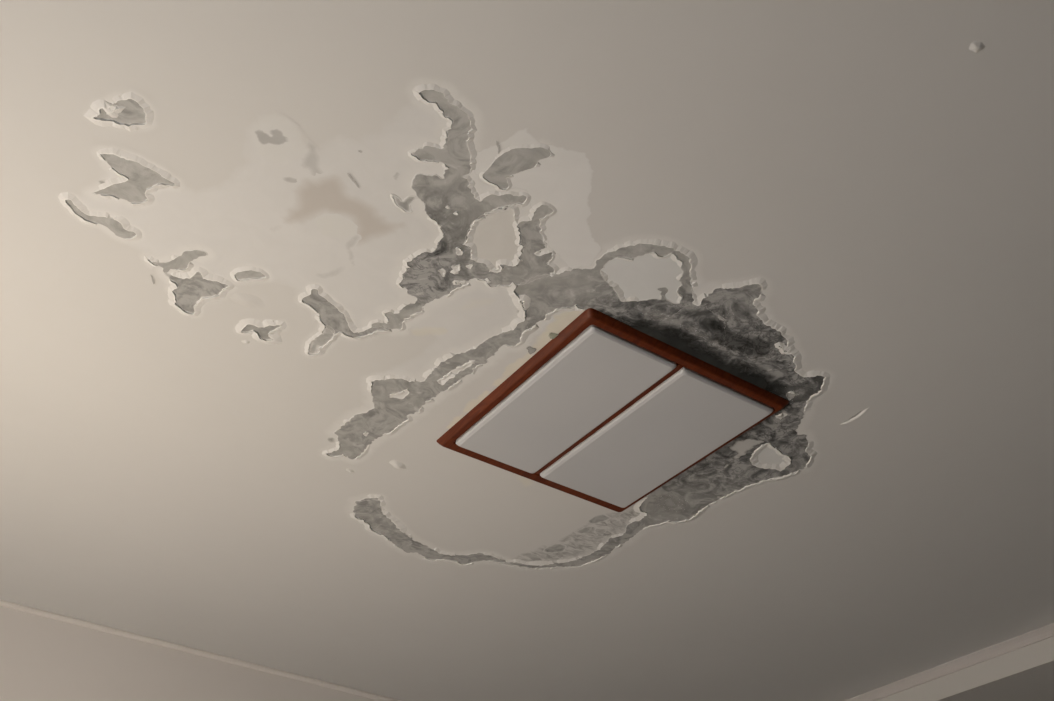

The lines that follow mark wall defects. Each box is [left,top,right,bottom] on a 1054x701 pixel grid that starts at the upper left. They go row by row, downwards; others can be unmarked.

peeling [51,83,280,322]
leakage [247,110,411,280]
peeling [227,70,842,574]
leakage [615,319,790,410]